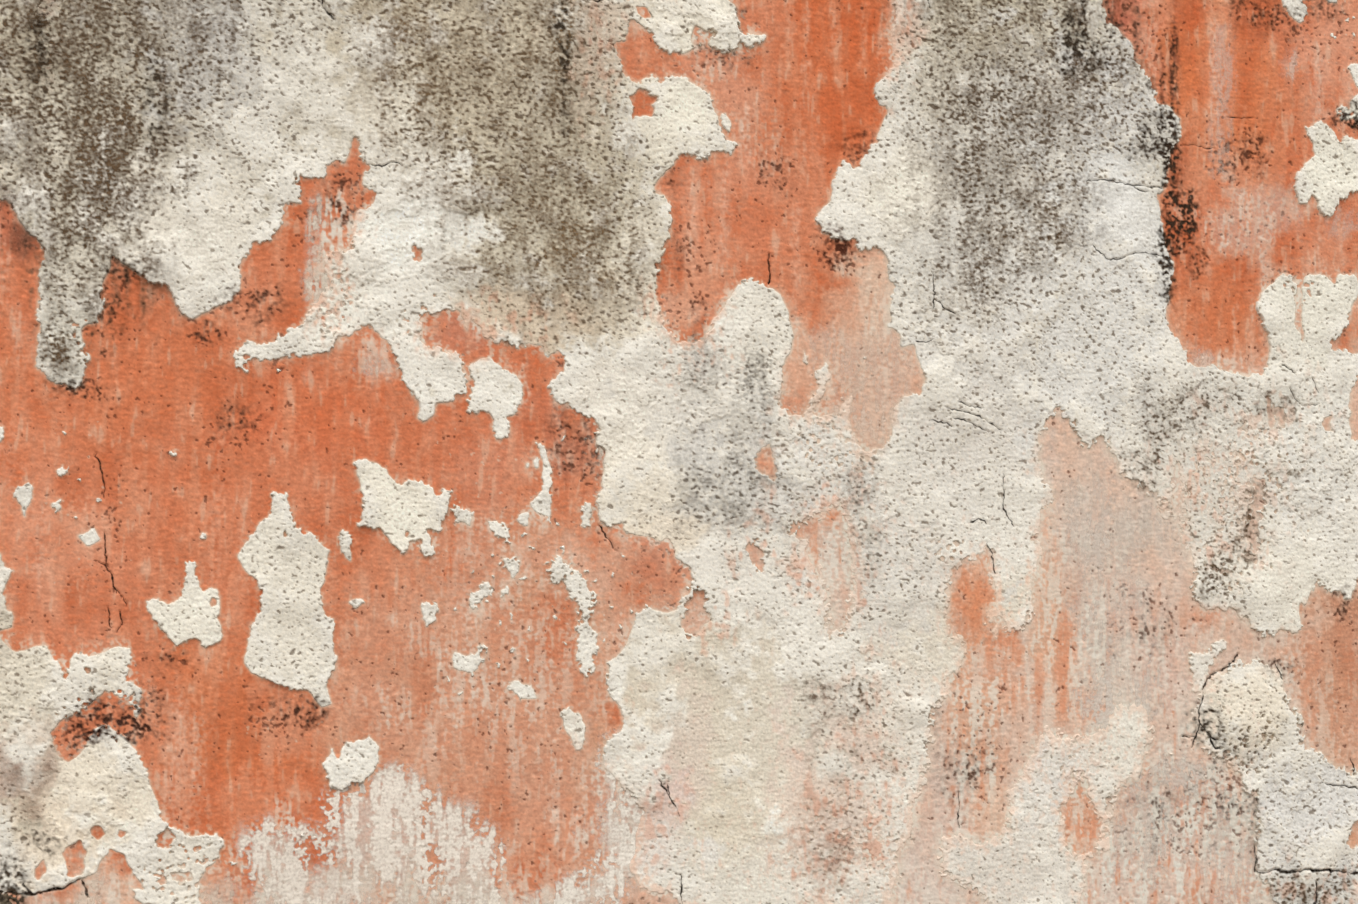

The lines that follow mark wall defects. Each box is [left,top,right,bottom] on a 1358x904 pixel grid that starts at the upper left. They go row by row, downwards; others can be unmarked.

leakage [43,317,70,370]
leakage [0,0,222,317]
flaking render [0,0,885,707]
leakage [374,0,634,325]
leakage [824,223,849,267]
flaking render [545,0,1358,904]
leakage [924,0,1135,301]
leakage [1129,35,1203,299]
leakage [0,862,25,904]
flaking render [0,554,509,904]
crack [1182,654,1238,749]
crack [1254,846,1358,904]